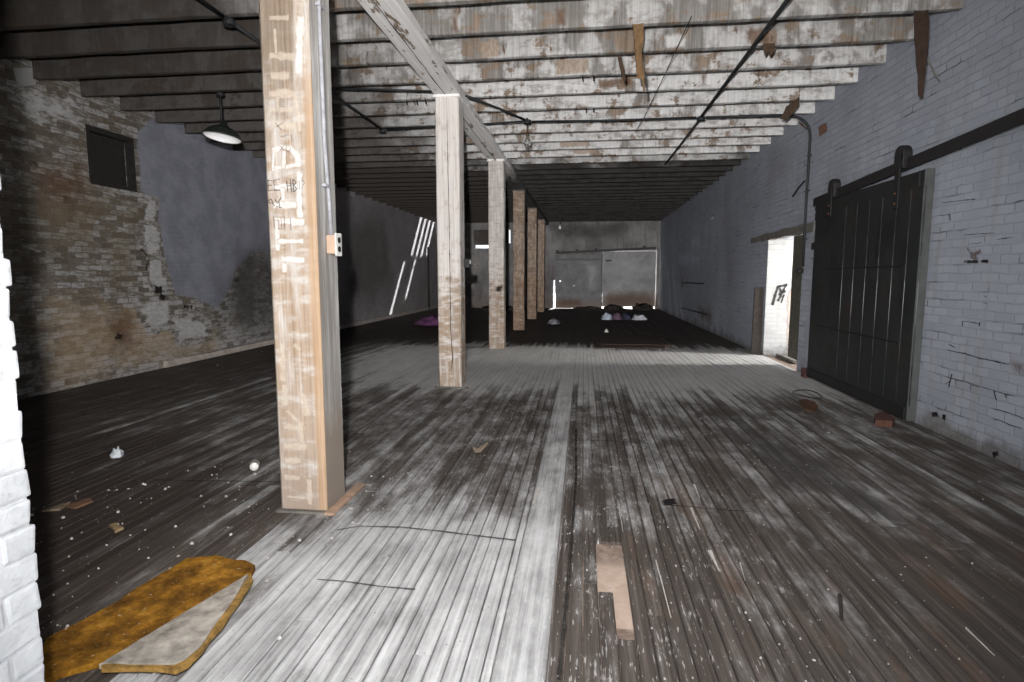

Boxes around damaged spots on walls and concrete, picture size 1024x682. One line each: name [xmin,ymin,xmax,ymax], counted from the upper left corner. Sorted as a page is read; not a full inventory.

peeling [0,64,96,142]
peeling [476,35,503,58]
peeling [551,55,593,75]
peeling [660,29,691,48]
peeling [556,141,597,155]
flaking render [129,110,270,348]
damp [9,171,228,399]
crack [946,296,1022,429]